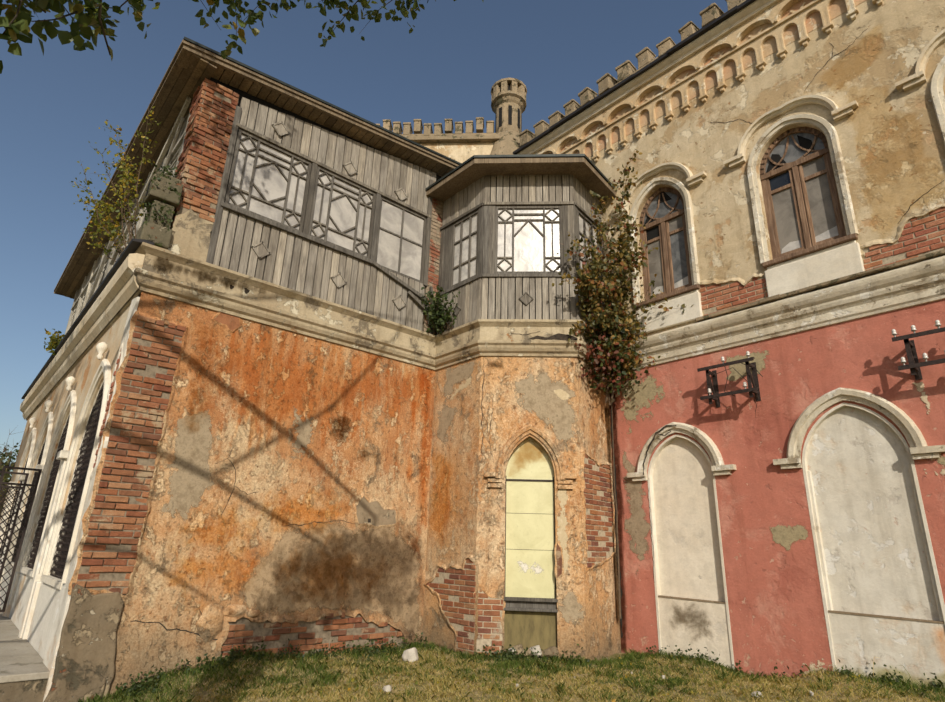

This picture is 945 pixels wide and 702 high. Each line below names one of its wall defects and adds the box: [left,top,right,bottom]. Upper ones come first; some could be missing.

flaking render [860,203,945,271]
flaking render [698,272,768,316]
flaking render [68,311,220,600]
water stain [289,406,314,458]
flaking render [514,372,651,574]
flaking render [620,374,665,434]
water stain [605,381,737,652]
flaking render [770,524,808,551]
flaking render [209,492,506,664]
crack [130,609,223,646]